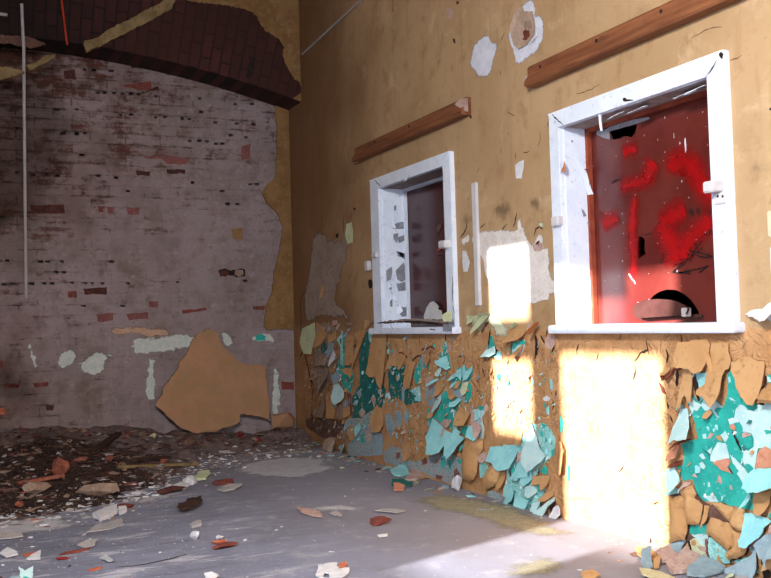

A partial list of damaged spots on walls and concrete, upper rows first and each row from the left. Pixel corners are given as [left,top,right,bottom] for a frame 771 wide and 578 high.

flaking render [0,0,301,98]
flaking render [470,36,497,77]
flaking render [508,0,543,64]
flaking render [30,204,65,214]
flaking render [68,287,107,298]
spalling [219,268,245,278]
flaking render [746,302,771,322]
peeling [252,333,274,342]
peeling [58,349,119,375]
peeling [131,334,194,401]
peeling [272,213,570,519]
peeling [650,338,771,578]